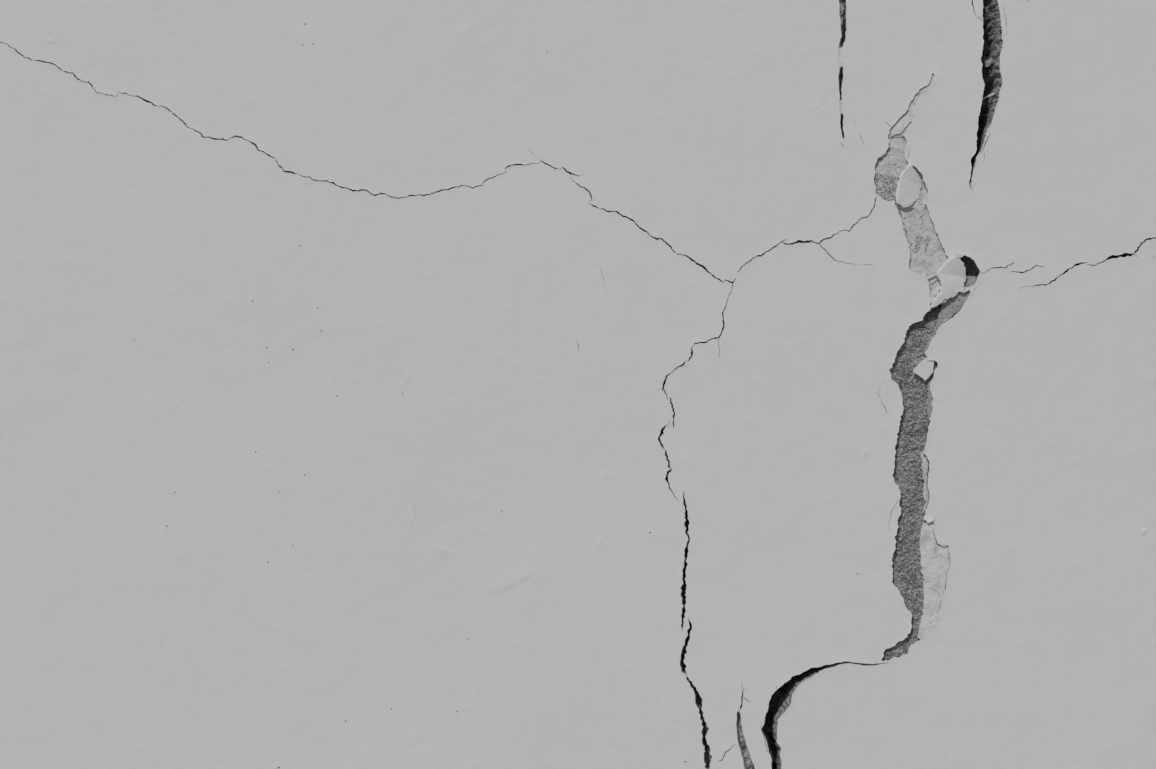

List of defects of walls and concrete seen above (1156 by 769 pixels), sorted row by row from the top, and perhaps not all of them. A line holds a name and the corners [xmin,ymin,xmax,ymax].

crack [838,0,865,145]
crack [969,0,1007,191]
crack [987,237,1156,287]
crack [0,42,886,769]
flaking render [874,73,982,661]